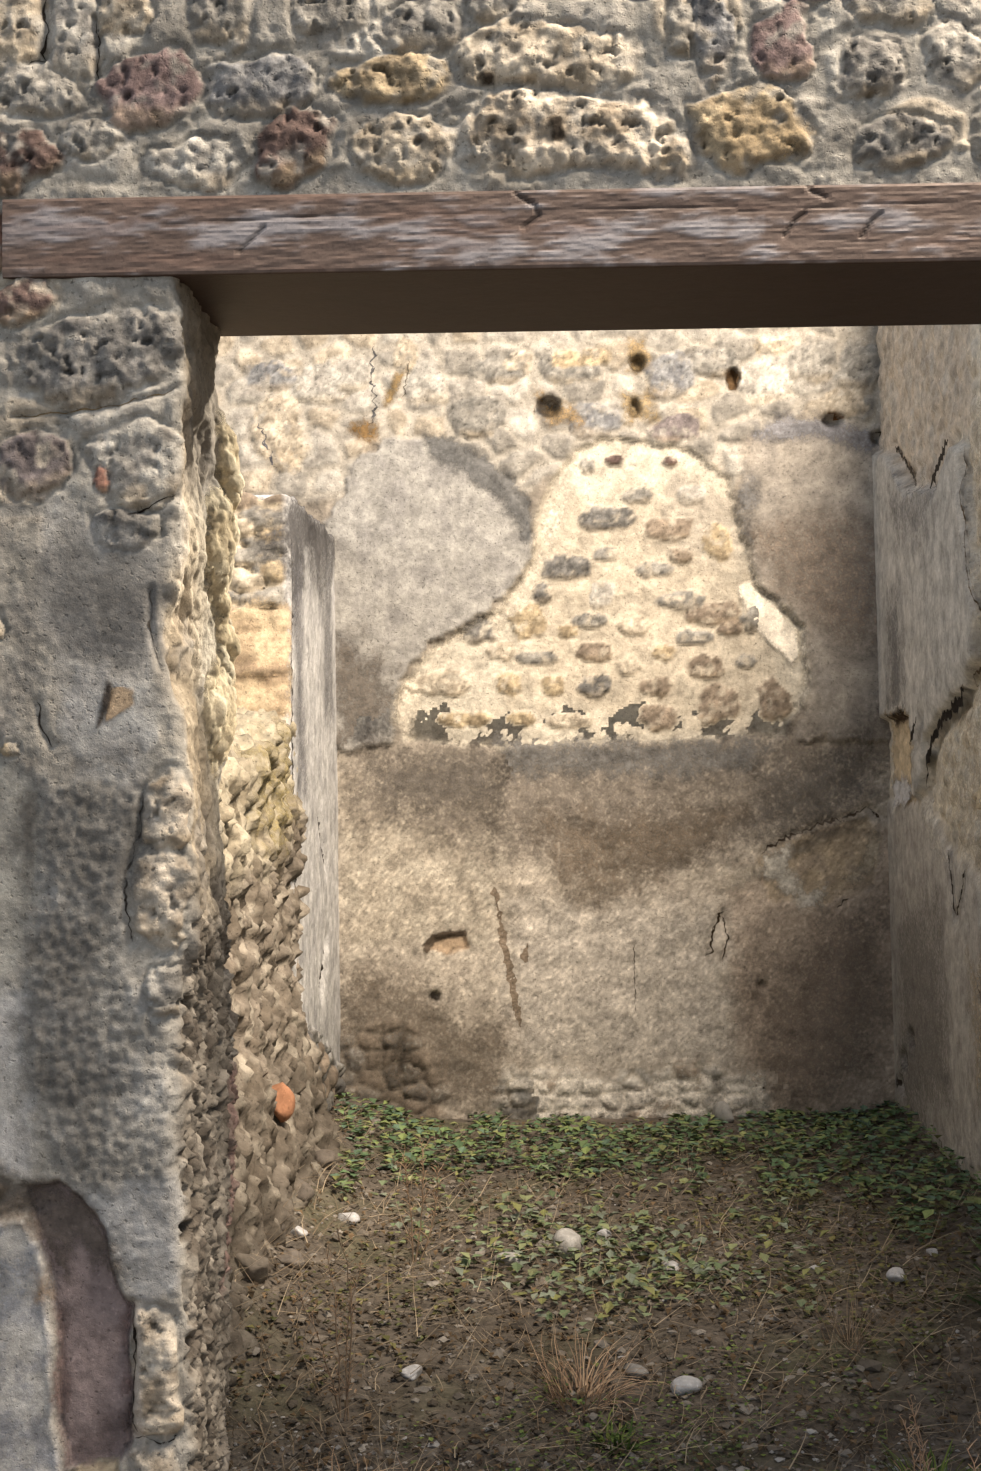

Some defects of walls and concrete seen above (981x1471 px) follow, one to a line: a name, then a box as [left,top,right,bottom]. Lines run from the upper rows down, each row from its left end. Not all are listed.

crack [37,702,51,745]
damp [257,475,905,908]
spalling [393,438,811,751]
spalling [886,708,917,806]
spalling [422,930,468,955]
peeling [28,1183,133,1471]